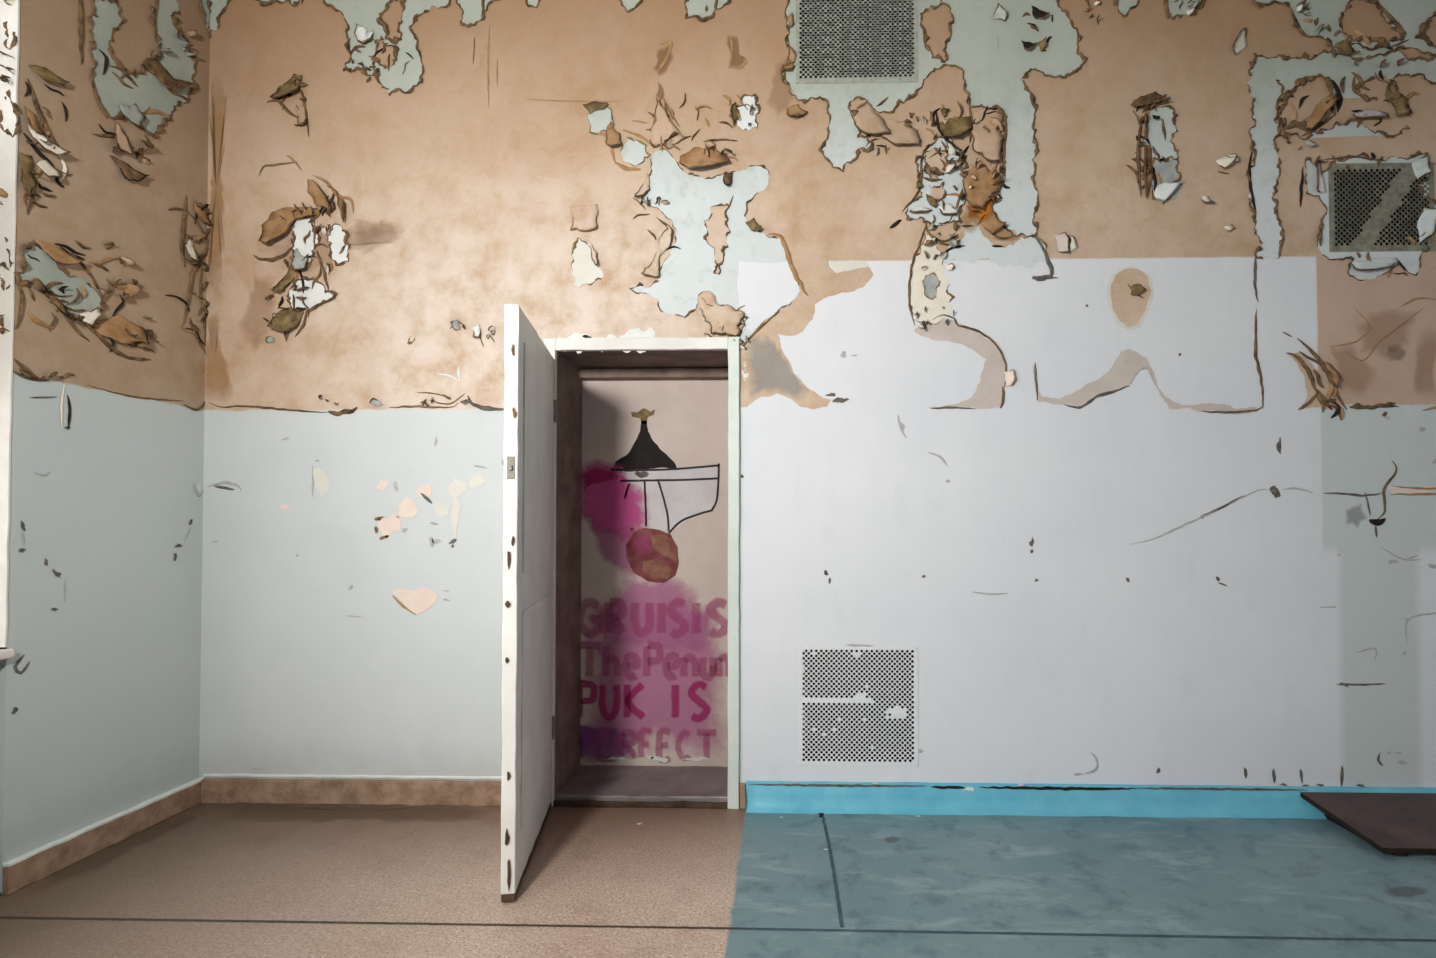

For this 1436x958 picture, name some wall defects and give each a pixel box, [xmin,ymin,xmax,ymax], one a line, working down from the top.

peeling [0,0,72,215]
peeling [0,237,159,361]
peeling [78,0,230,182]
peeling [89,366,517,418]
peeling [253,155,354,343]
peeling [323,0,496,96]
peeling [583,93,873,409]
peeling [780,0,1139,409]
crack [1253,257,1264,407]
peeling [1216,0,1436,281]
peeling [1282,331,1399,420]
crack [1130,437,1397,545]